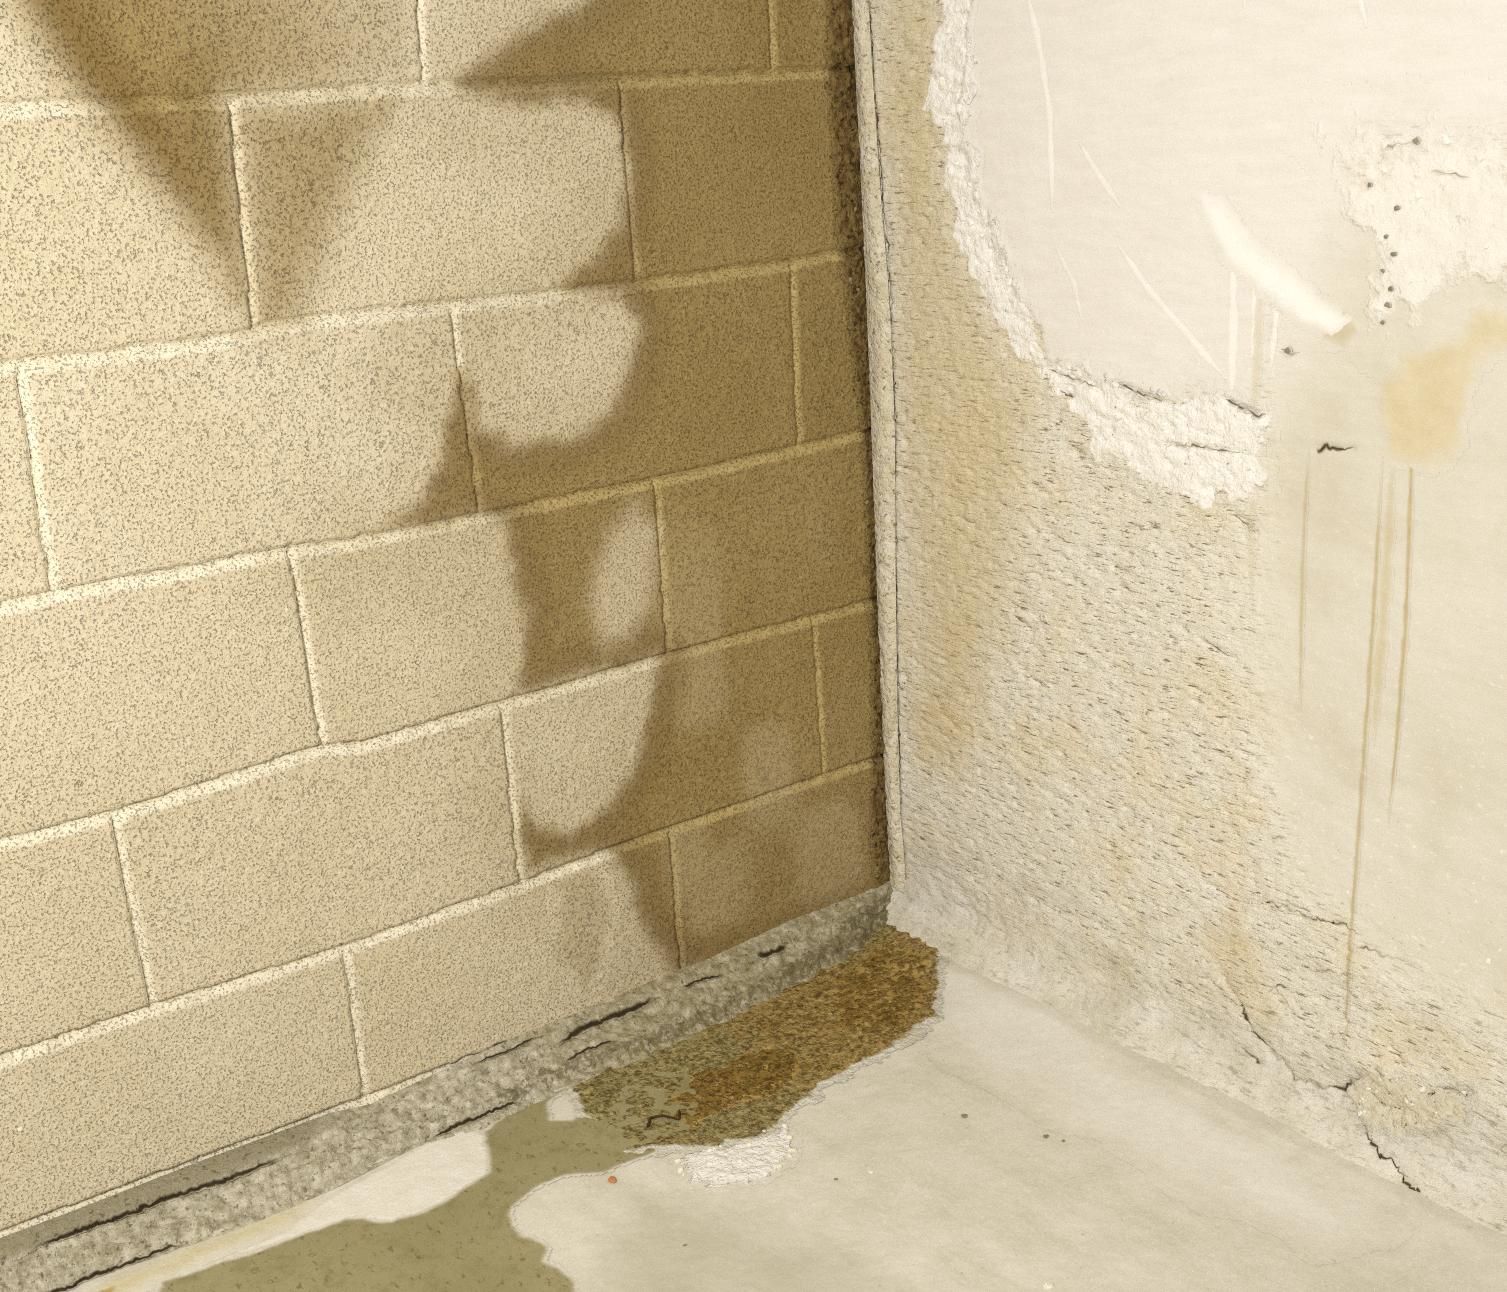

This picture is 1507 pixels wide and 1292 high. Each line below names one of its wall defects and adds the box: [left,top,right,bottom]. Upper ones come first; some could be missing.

flaking render [922,0,1281,533]
spalling [1278,71,1507,378]
damp [1319,310,1358,351]
damp [0,0,893,1254]
crack [426,1098,522,1140]
crack [1224,899,1471,1203]
spalling [1341,1066,1478,1140]
crack [17,1151,293,1260]
crack [40,1238,193,1292]